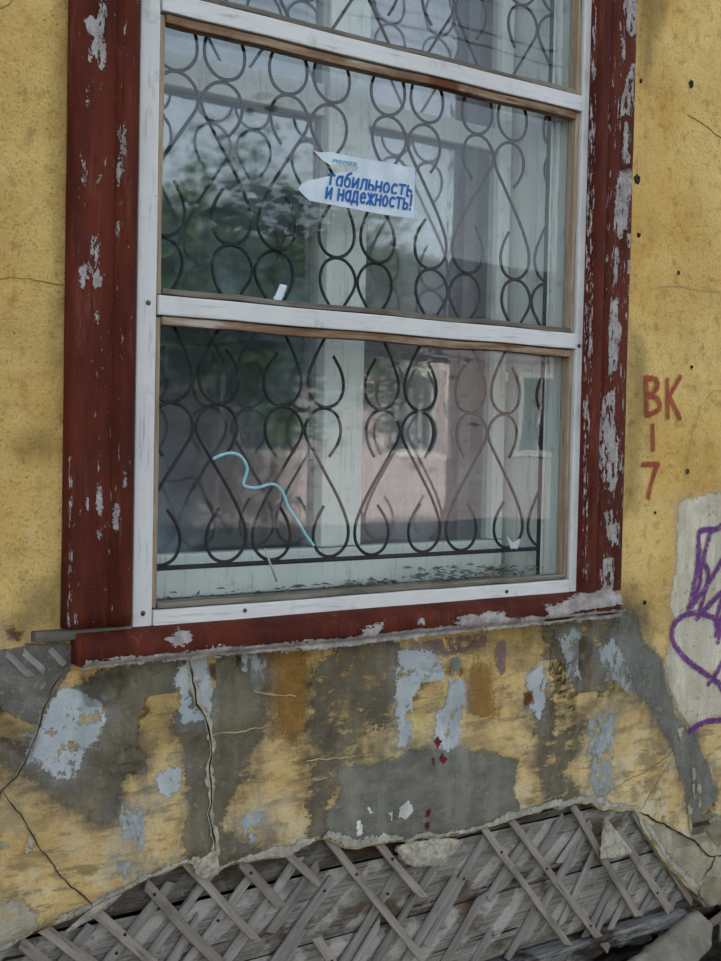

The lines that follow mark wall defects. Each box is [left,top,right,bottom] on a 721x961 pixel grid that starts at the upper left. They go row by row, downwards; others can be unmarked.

peeling [79,0,127,70]
peeling [74,221,123,289]
peeling [78,122,127,190]
peeling [583,94,596,384]
peeling [598,0,638,549]
peeling [68,446,122,540]
peeling [582,396,590,580]
crack [0,667,92,907]
crack [187,660,274,856]
peeling [0,549,639,951]
crack [605,750,721,881]